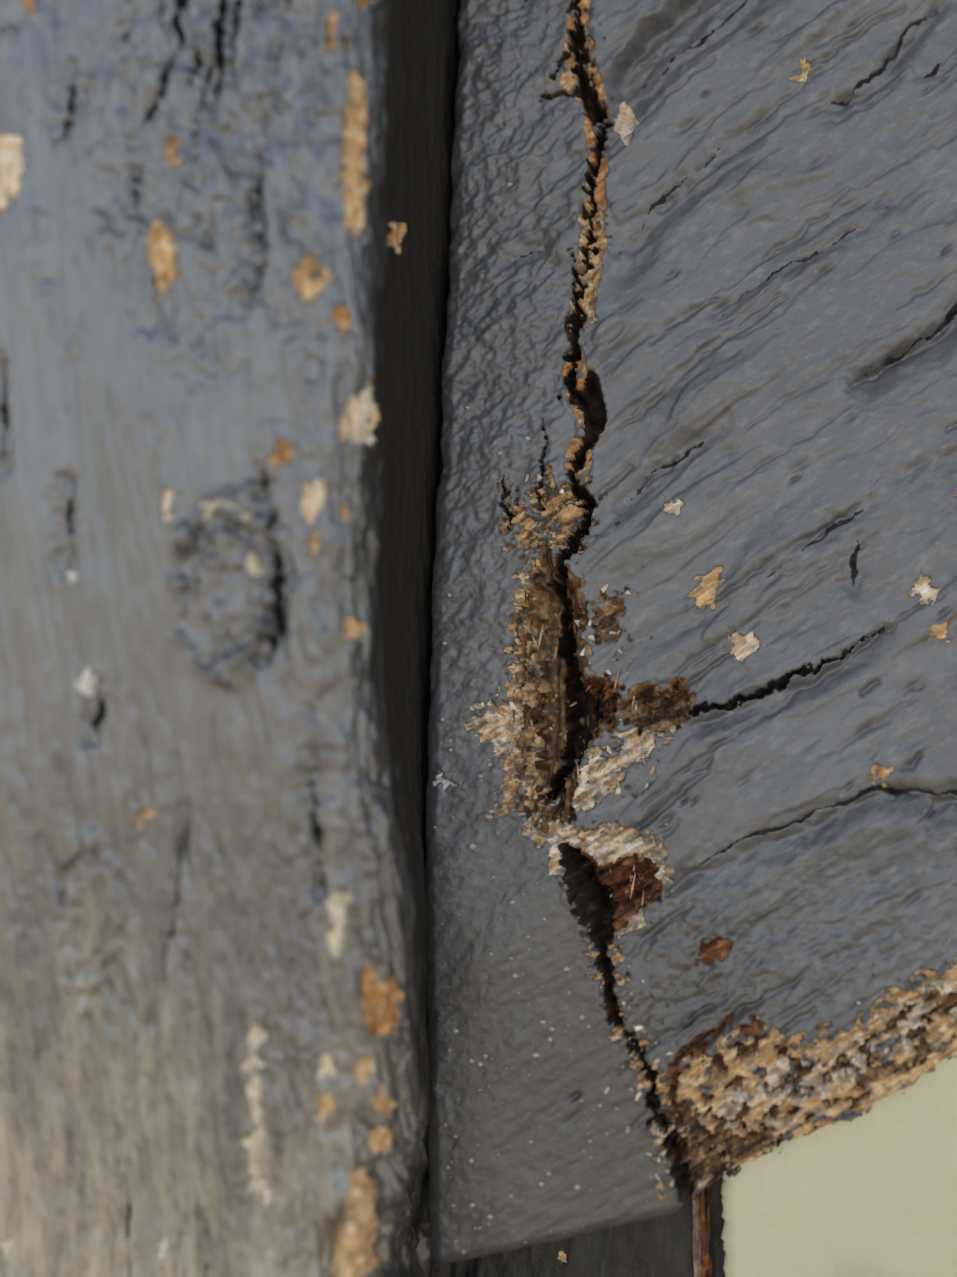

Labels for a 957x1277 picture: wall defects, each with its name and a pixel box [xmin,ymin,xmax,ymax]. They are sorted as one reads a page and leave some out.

peeling [0,133,25,211]
peeling [339,69,371,242]
peeling [663,499,684,515]
crack [463,0,957,1205]
peeling [314,1053,337,1128]
peeling [330,1055,397,1277]
peeling [358,965,405,1039]
peeling [629,935,957,1190]